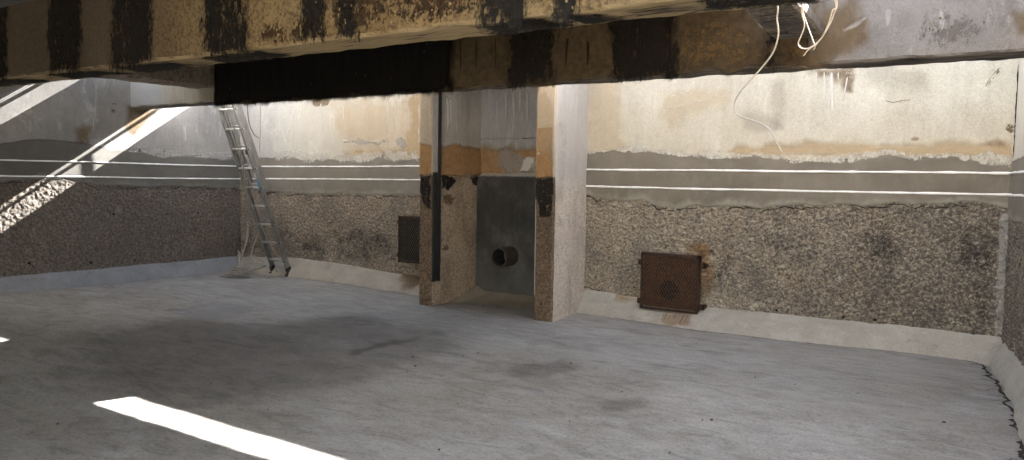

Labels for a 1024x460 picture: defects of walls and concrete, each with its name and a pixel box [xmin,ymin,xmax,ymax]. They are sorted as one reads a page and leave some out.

damp [697,0,866,111]
damp [587,143,1011,167]
crack [964,360,1024,460]